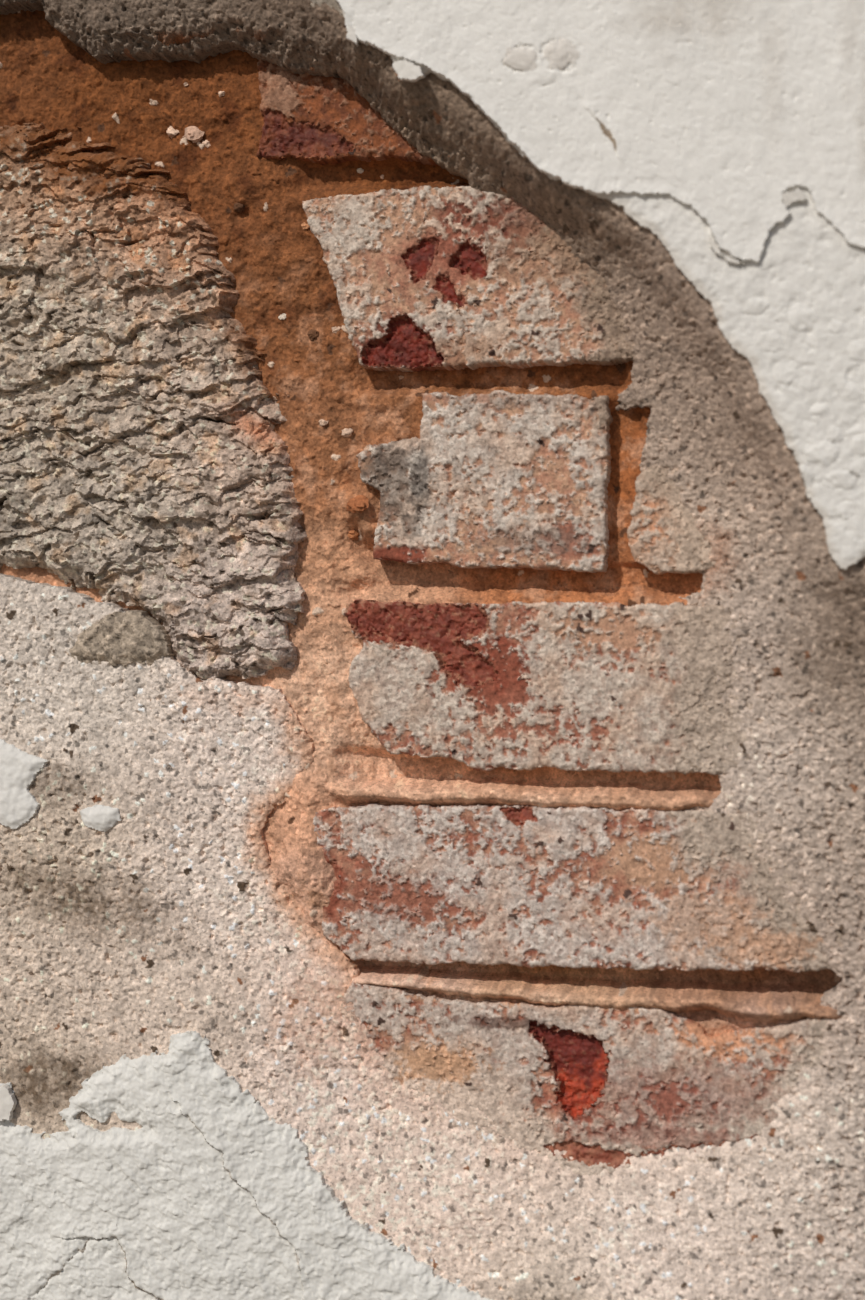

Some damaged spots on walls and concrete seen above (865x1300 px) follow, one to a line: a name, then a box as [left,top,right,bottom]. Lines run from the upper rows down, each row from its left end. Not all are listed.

spalling [0,0,478,190]
peeling [310,0,865,570]
spalling [345,600,498,689]
peeling [0,739,49,830]
peeling [79,805,123,832]
spalling [500,807,538,826]
spalling [528,1021,611,1120]
crack [188,1115,301,1271]
spalling [543,1135,757,1169]
crack [36,1237,163,1300]